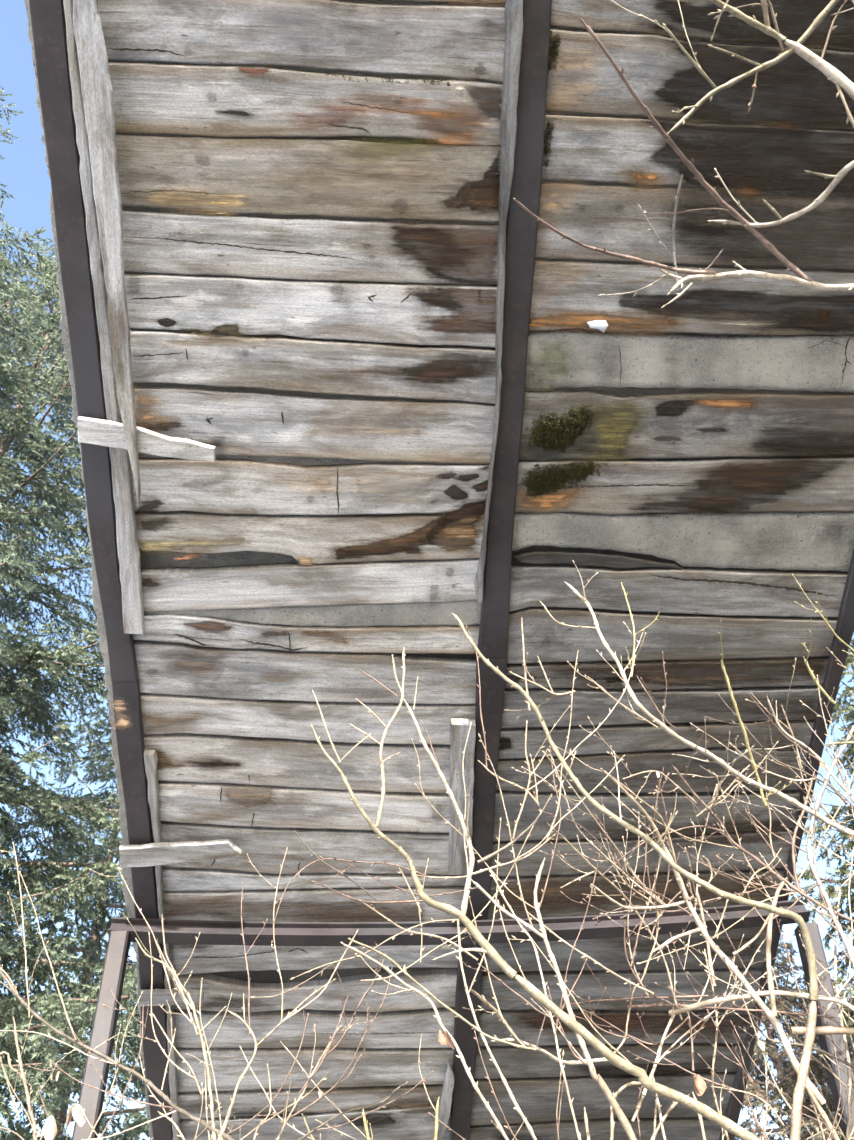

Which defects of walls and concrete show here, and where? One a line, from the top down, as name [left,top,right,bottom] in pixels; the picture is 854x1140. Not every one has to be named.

leakage [641,0,854,269]
leakage [393,226,498,333]
leakage [630,404,854,516]
leakage [335,499,486,559]